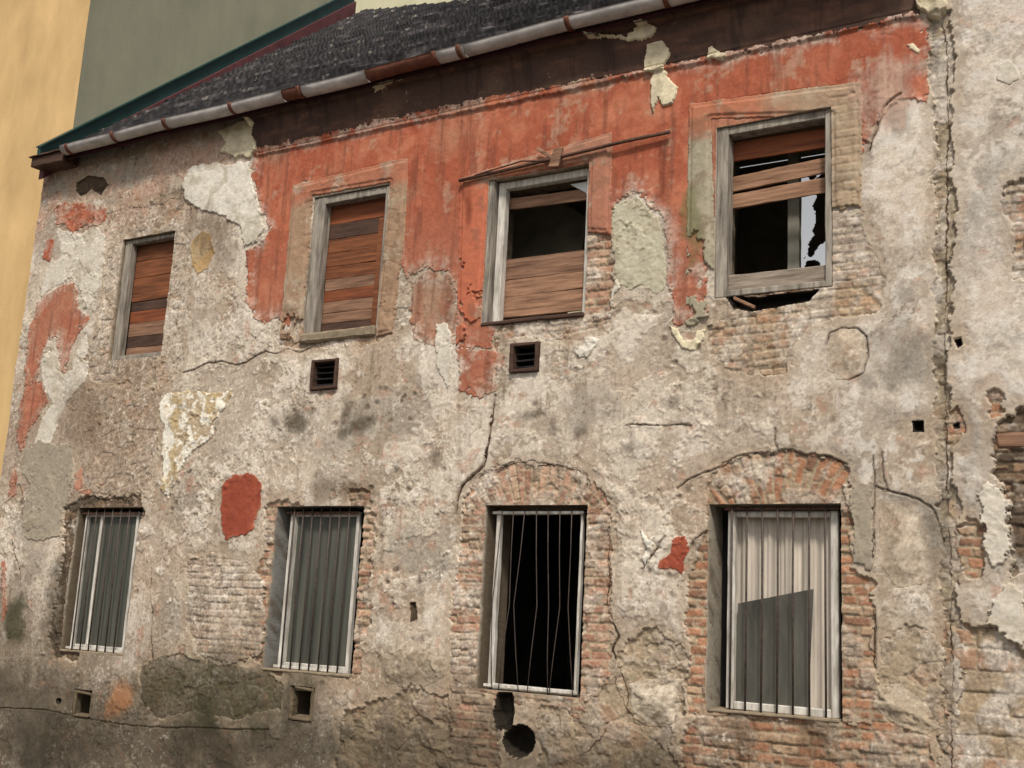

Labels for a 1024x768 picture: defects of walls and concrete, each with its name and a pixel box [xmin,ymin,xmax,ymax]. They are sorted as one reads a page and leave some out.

peeling [6,464,18,501]
spalling [16,196,231,662]
spalling [139,473,301,720]
crack [456,399,590,513]
peeling [181,0,1024,651]
spalling [335,450,936,768]
crack [870,25,955,768]
spalling [877,582,1024,768]